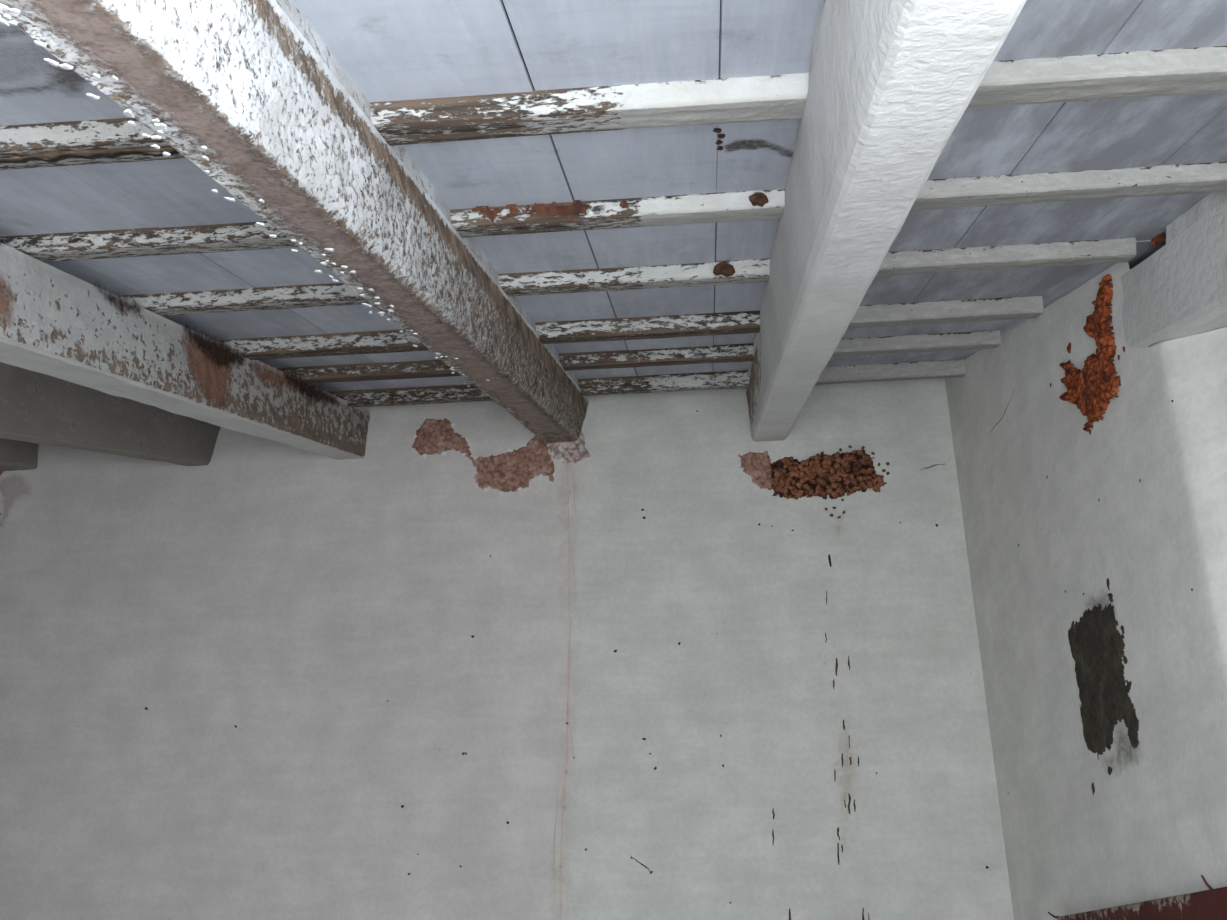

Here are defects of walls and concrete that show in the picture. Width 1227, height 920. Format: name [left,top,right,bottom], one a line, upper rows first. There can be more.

peeling [0,4,21,26]
peeling [34,41,74,70]
damp [32,63,82,92]
peeling [0,109,180,163]
peeling [473,200,592,223]
peeling [314,248,394,320]
flaking render [1050,274,1125,435]
flaking render [411,418,591,496]
flaking render [738,445,890,518]